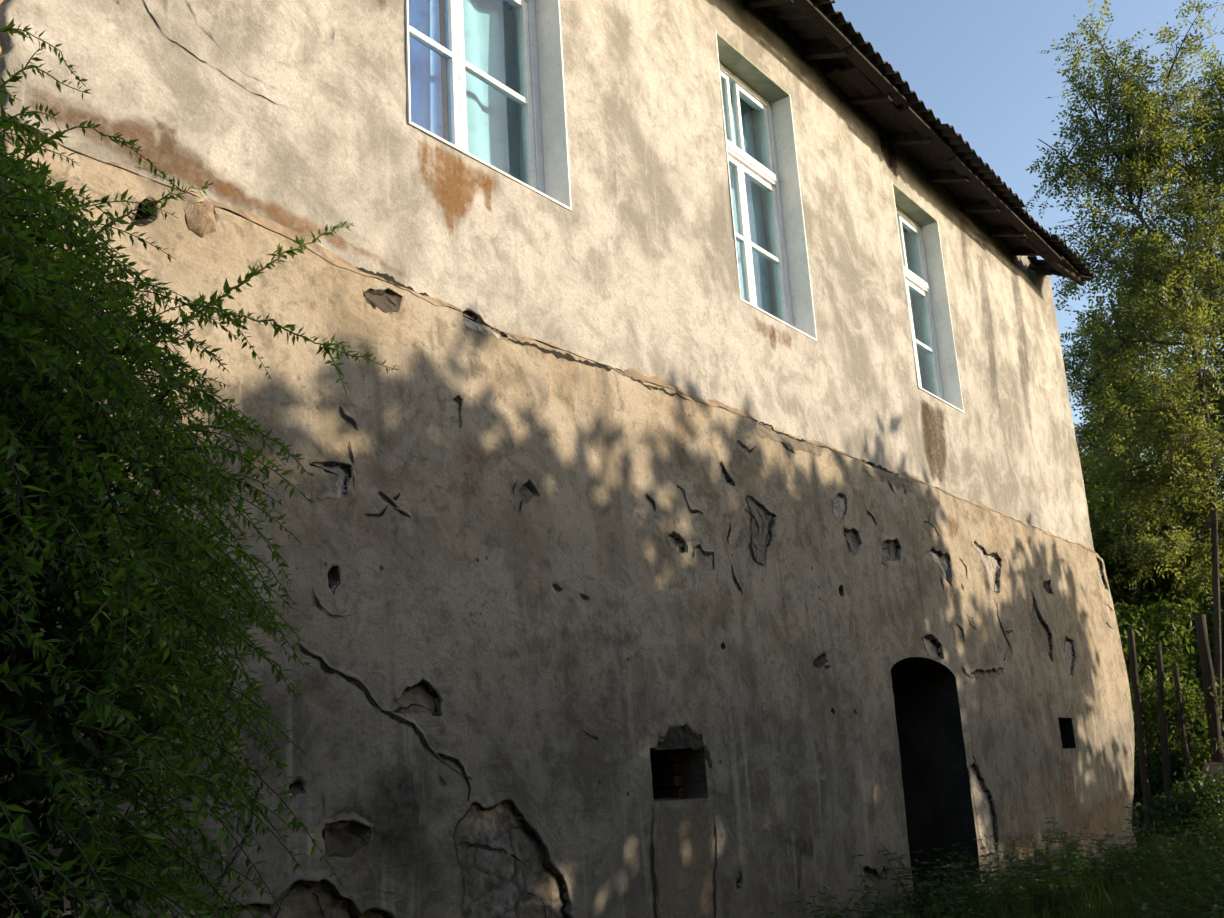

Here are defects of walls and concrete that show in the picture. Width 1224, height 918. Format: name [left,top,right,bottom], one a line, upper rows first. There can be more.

crack [143,0,301,114]
leakage [34,99,252,209]
corrosion [419,144,492,230]
spalling [362,282,403,313]
spalling [309,442,355,499]
crack [365,488,411,517]
crack [646,484,744,594]
spalling [721,461,778,567]
leakage [922,402,947,481]
crack [296,638,435,756]
spalling [216,811,410,918]
spalling [451,792,581,918]